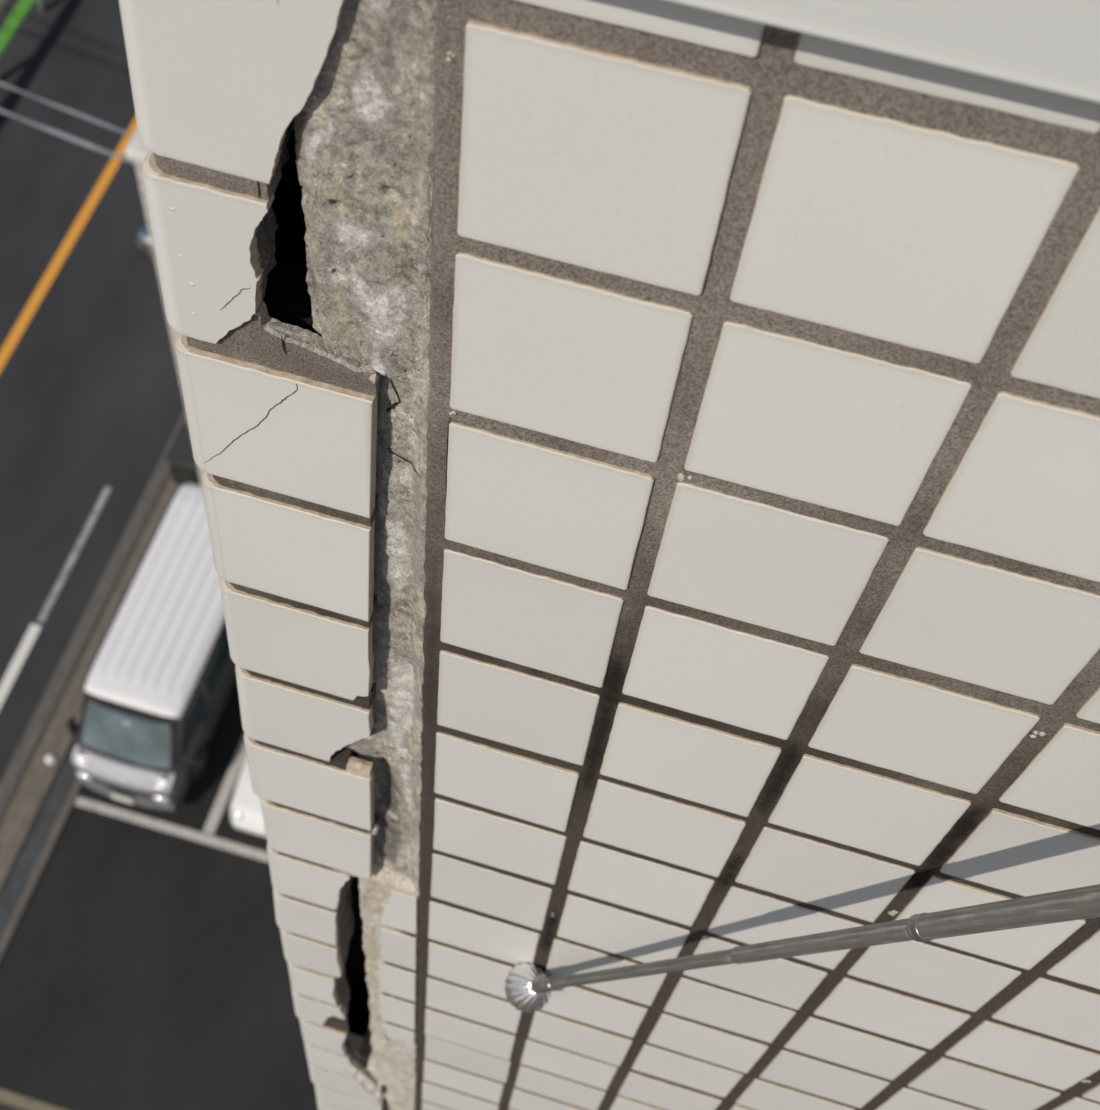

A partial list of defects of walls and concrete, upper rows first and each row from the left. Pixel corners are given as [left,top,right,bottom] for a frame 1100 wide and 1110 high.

crack [204,384,298,463]
spalling [186,0,437,1110]